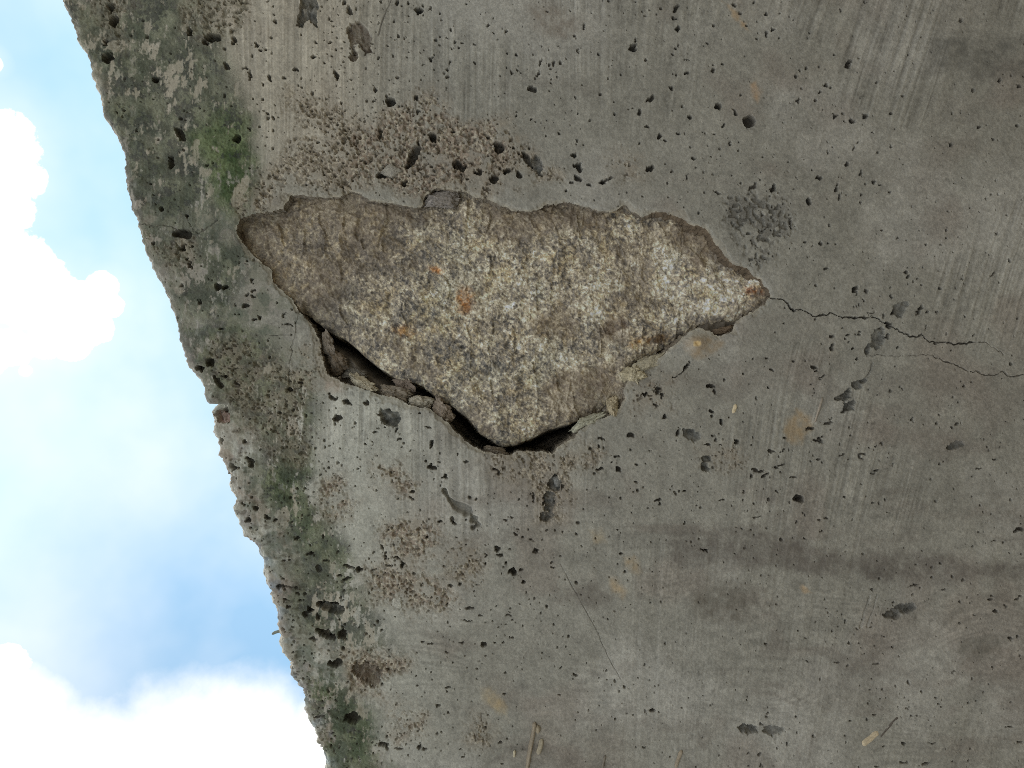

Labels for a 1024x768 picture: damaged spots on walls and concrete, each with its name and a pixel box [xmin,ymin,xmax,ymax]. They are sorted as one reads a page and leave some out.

spalling [236,182,797,455]
crack [769,297,1024,377]
spalling [675,409,723,472]